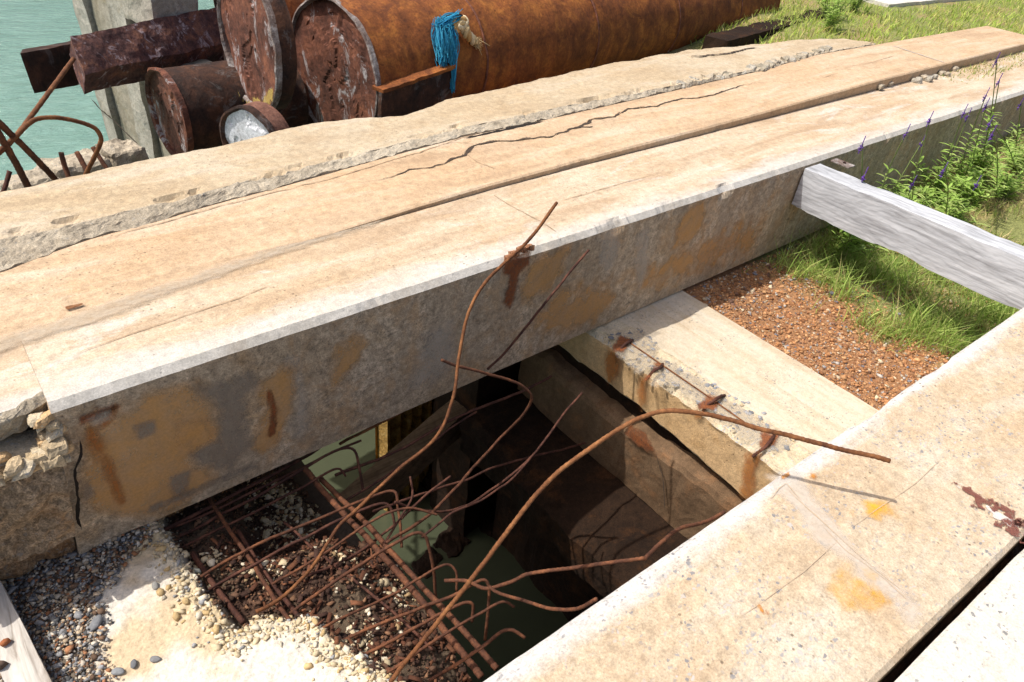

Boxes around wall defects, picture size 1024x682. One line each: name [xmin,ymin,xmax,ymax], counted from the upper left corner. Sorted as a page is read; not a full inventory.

crack [90,84,750,242]
corrosion [504,244,535,309]
spalling [0,410,74,487]
crack [73,441,83,529]
corrosion [79,406,125,504]
spalling [164,201,891,682]
corrosion [695,396,718,418]
corrosion [740,432,778,498]